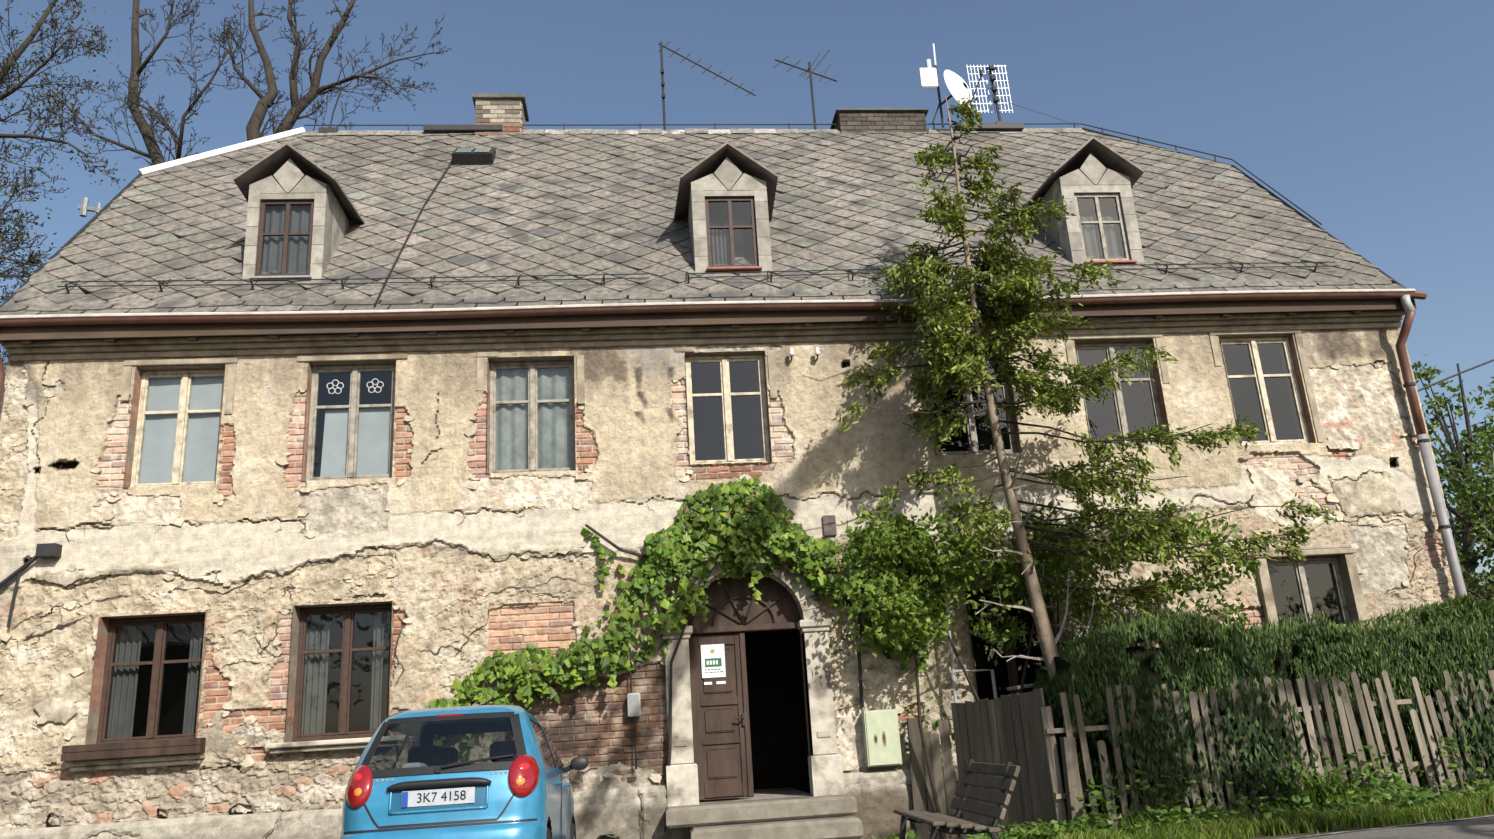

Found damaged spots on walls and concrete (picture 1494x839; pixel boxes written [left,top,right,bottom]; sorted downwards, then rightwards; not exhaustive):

flaking render [0,362,184,541]
flaking render [213,425,236,506]
flaking render [276,389,415,538]
flaking render [463,393,599,510]
flaking render [671,379,794,482]
flaking render [1238,360,1443,595]
crack [0,505,592,685]
flaking render [0,555,416,830]
flaking render [510,661,668,790]